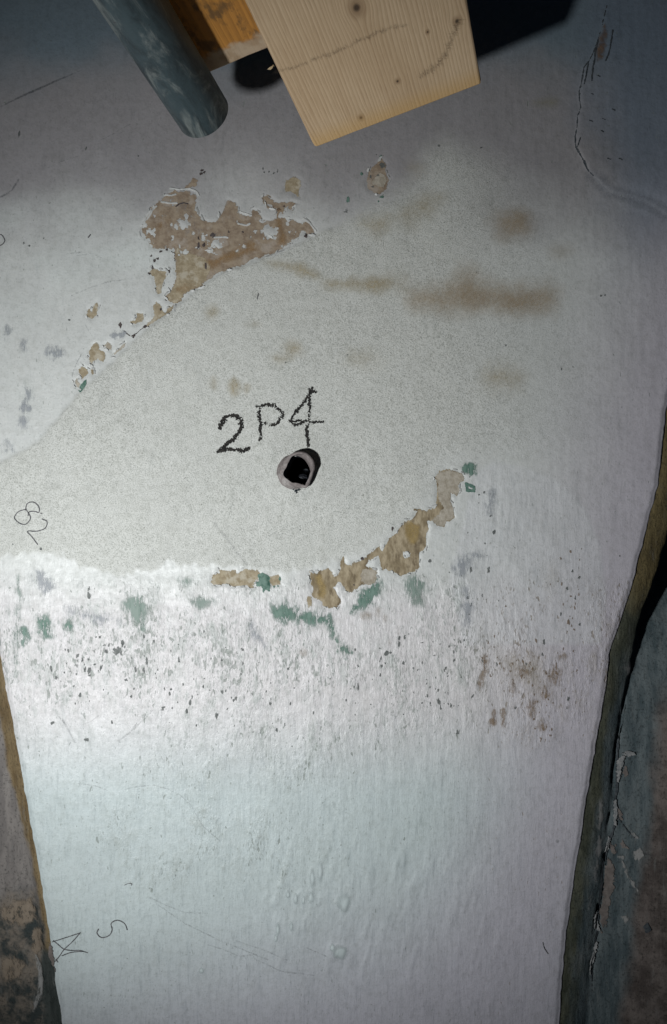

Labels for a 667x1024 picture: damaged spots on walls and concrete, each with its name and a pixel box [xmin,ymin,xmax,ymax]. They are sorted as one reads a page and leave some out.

crack [574,5,622,176]
spalling [360,155,391,202]
peeling [71,169,317,392]
peeling [211,567,281,593]
peeling [307,468,465,611]
peeling [618,830,644,892]